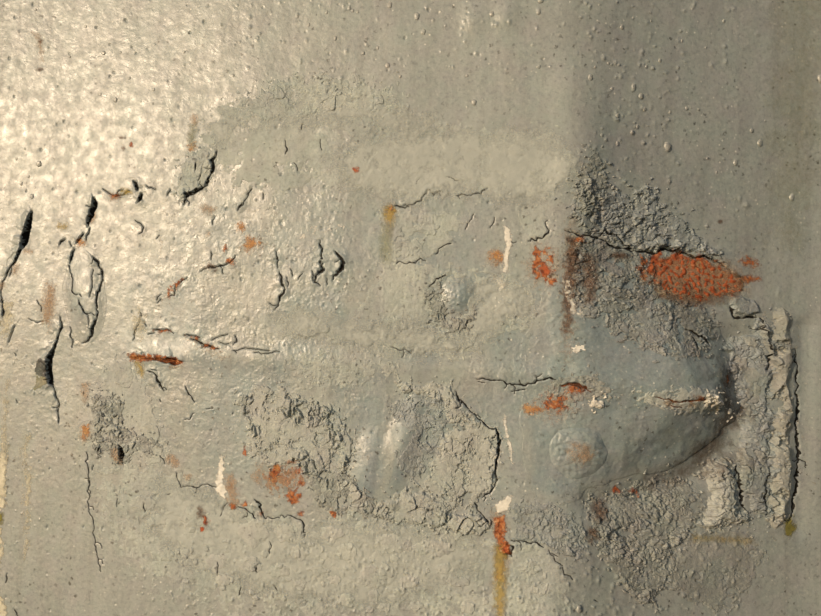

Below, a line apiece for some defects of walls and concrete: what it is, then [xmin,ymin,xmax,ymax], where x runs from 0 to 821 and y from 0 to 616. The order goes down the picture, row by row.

crack [393,177,495,229]
crack [0,150,217,423]
crack [269,240,345,311]
rust [532,237,596,332]
rust [636,251,759,303]
rust [128,353,183,374]
peeling [76,67,807,616]
rust [524,385,584,415]
crack [85,445,125,572]
rust [257,460,305,516]
rust [494,515,511,616]